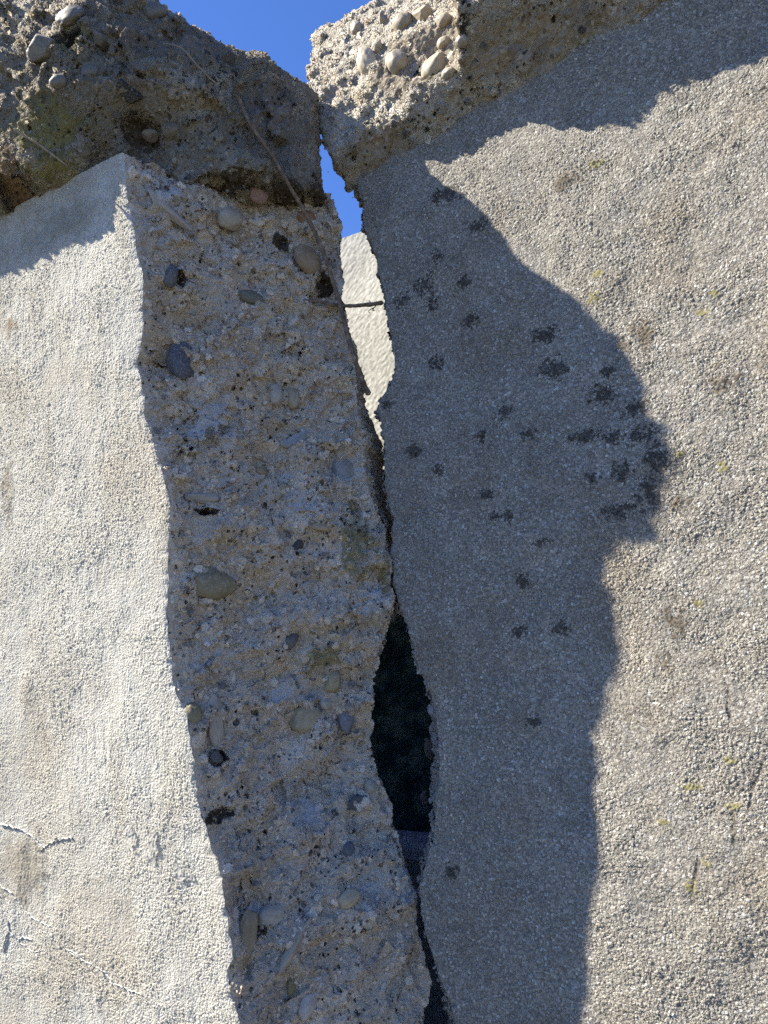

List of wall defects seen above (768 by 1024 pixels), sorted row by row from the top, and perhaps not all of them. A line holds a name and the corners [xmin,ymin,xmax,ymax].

spalling [355,185,377,260]
spalling [374,273,440,898]
crack [0,824,73,851]
crack [0,884,141,995]